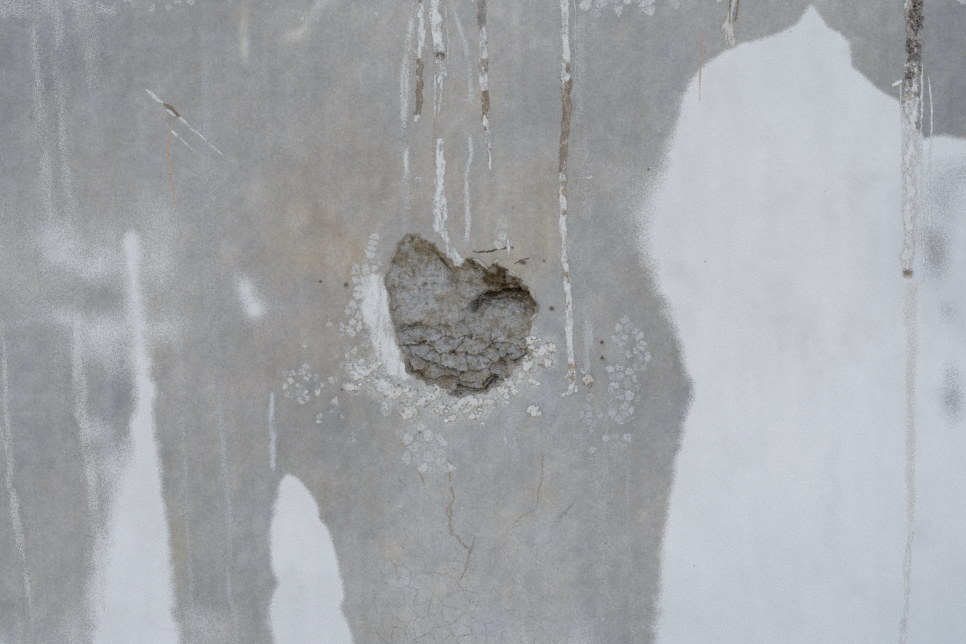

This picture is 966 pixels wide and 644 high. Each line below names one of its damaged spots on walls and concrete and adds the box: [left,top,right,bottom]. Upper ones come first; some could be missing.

spalling [282,221,553,423]